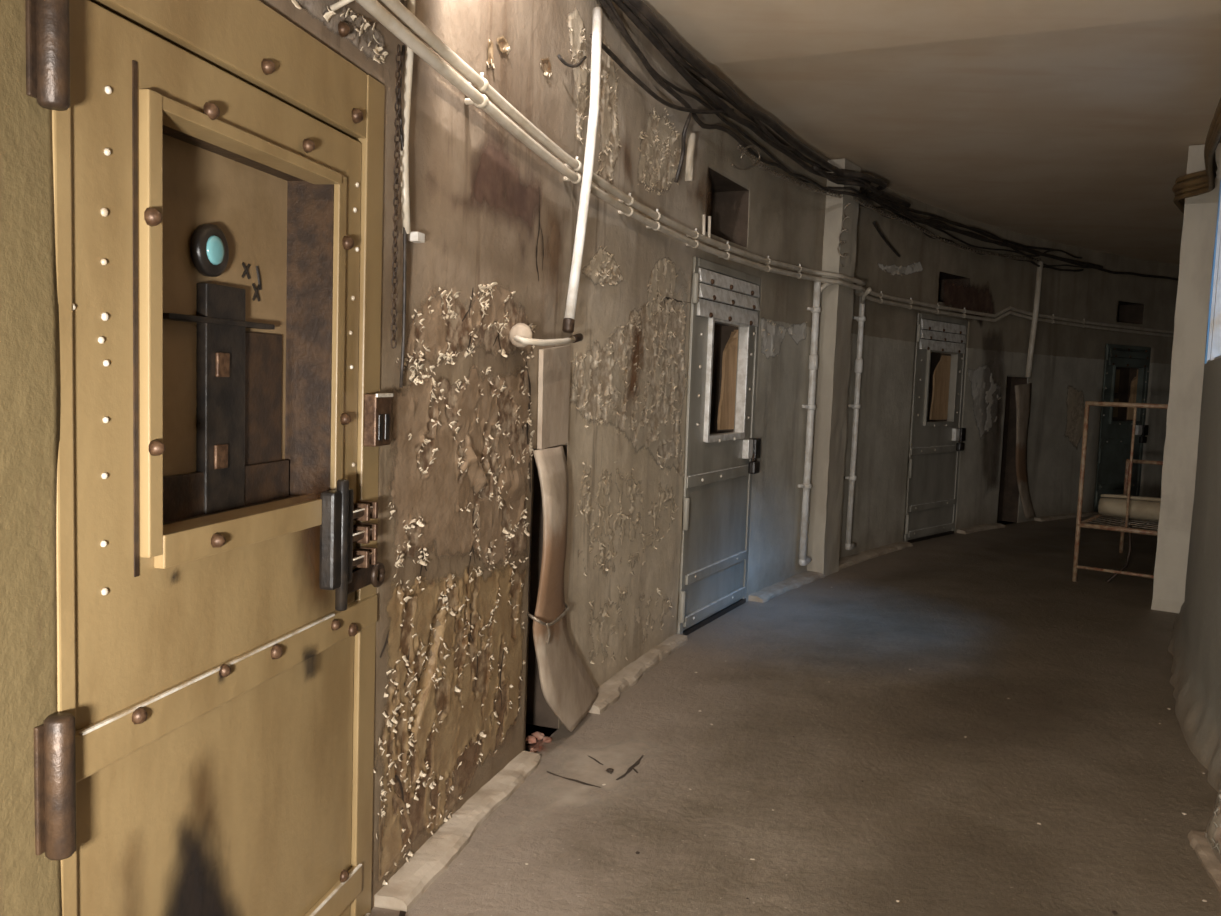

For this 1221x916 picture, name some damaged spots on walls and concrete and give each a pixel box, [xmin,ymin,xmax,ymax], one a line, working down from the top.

peeling [291,0,389,64]
peeling [566,7,622,184]
peeling [638,107,682,196]
peeling [582,246,624,286]
peeling [569,257,687,576]
peeling [373,282,536,886]
peeling [1204,790,1221,853]